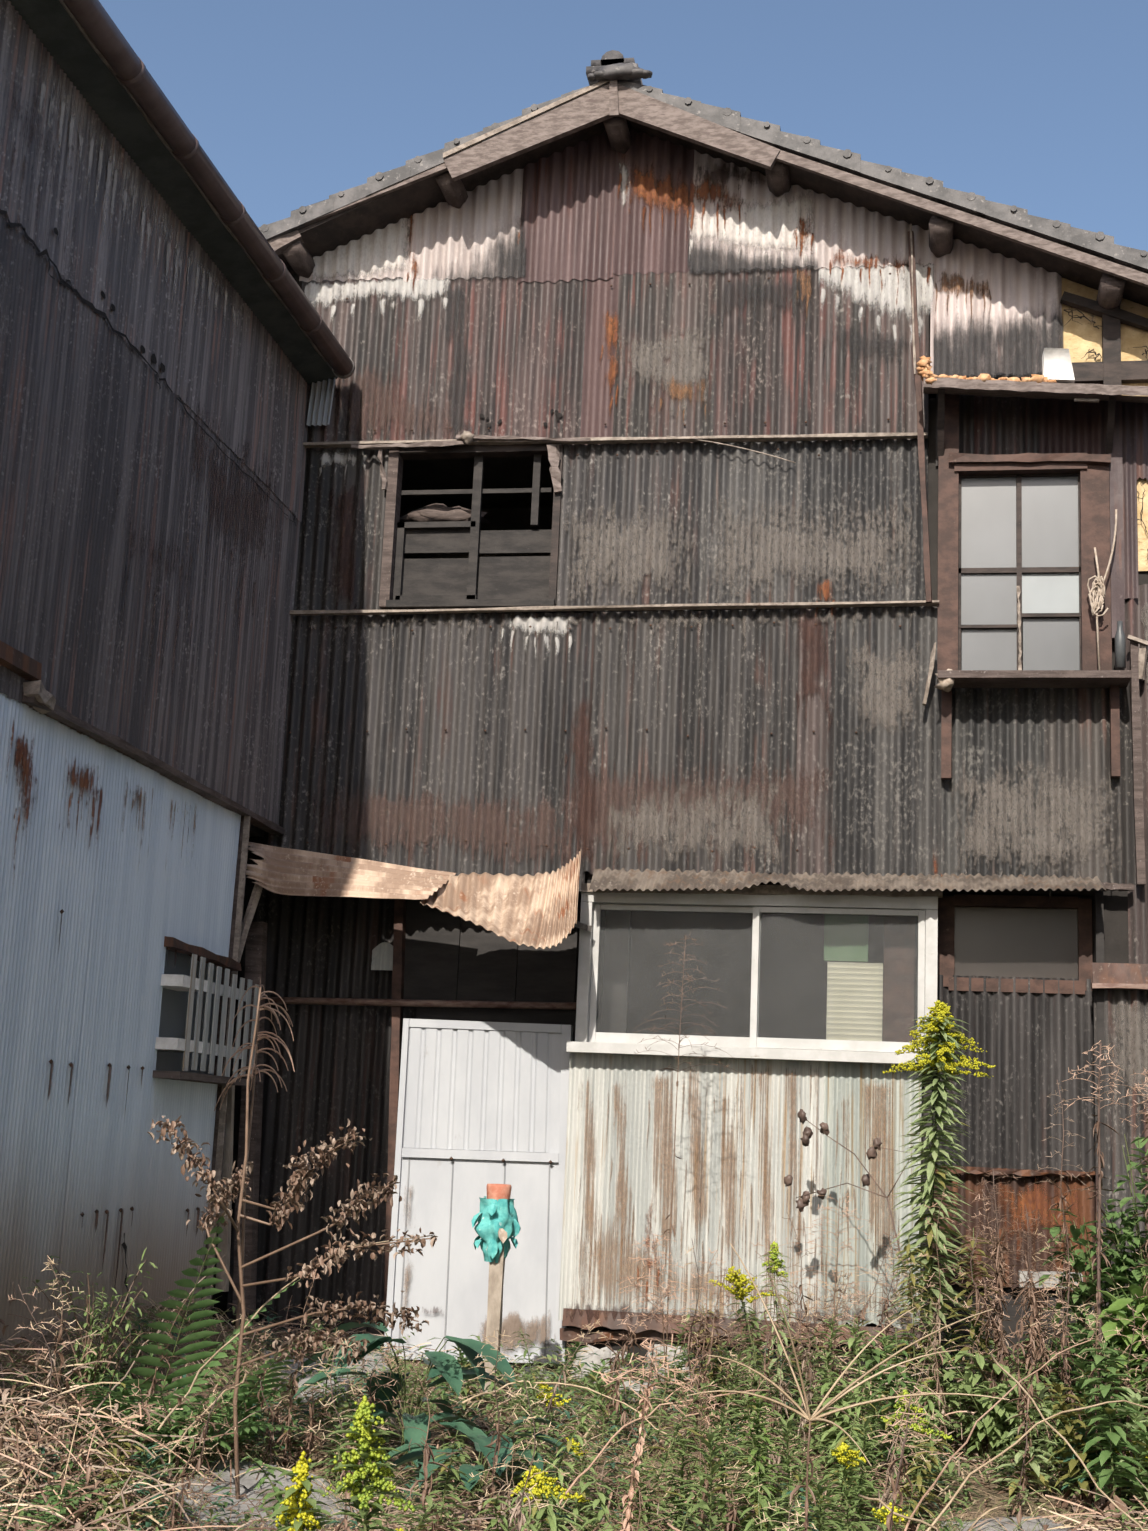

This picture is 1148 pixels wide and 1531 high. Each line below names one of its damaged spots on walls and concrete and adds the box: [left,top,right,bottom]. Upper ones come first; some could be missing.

rust [618,157,760,239]
water stain [721,276,807,330]
rust [6,720,38,870]
rust [59,759,102,848]
rust [562,1069,929,1349]
rust [935,1169,1096,1260]